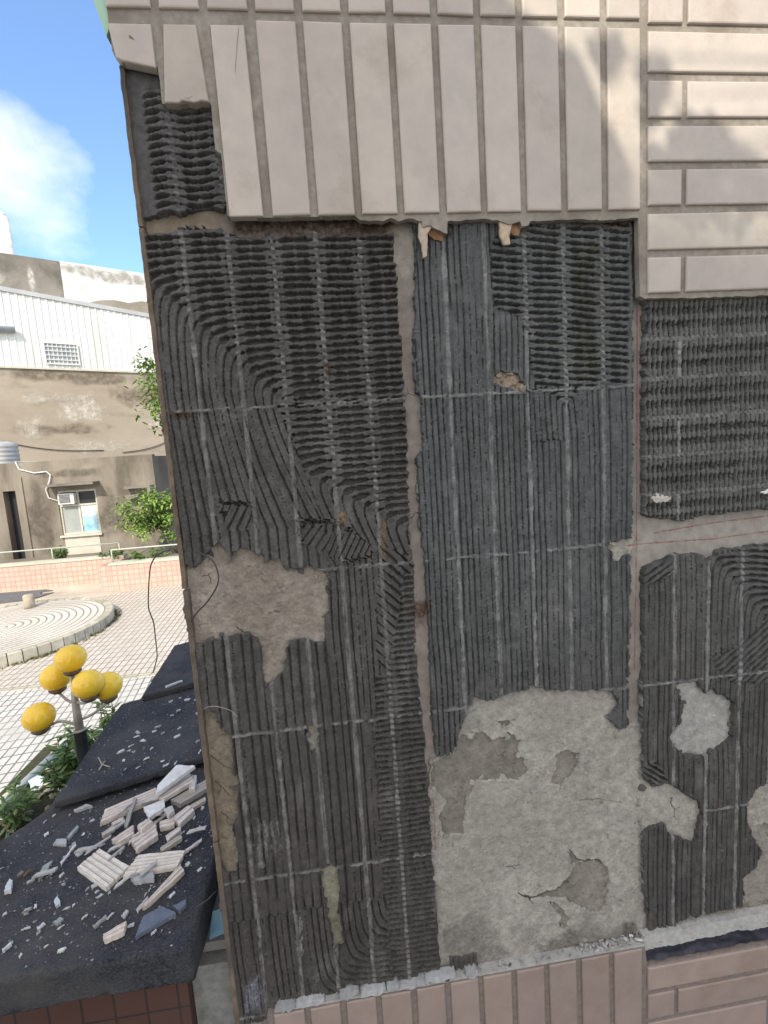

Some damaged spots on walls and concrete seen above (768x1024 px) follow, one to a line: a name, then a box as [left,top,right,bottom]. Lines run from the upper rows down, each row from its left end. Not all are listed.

peeling [418,222,444,259]
peeling [498,222,521,246]
spalling [493,371,527,393]
peeling [651,493,671,503]
spalling [608,536,634,561]
spalling [186,542,330,688]
spalling [306,726,319,752]
spalling [670,681,732,755]
spalling [117,697,240,871]
spalling [427,685,700,967]
spalling [679,783,768,922]
spalling [320,864,344,945]